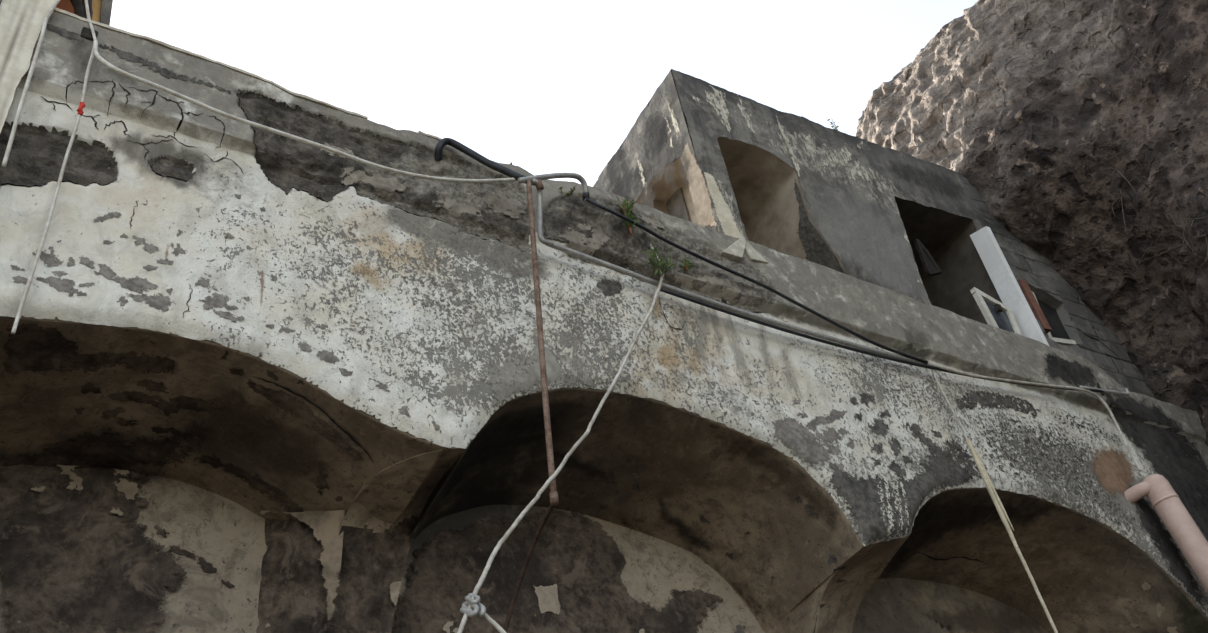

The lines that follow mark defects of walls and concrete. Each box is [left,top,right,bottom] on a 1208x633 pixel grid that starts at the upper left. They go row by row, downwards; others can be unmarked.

flaking render [47,24,85,41]
flaking render [0,121,118,188]
crack [41,78,244,174]
peeling [11,229,186,312]
flaking render [94,44,1153,544]
crack [252,376,374,463]
corrosion [1092,449,1133,494]
water stain [877,468,1041,572]
flaking render [391,508,723,633]